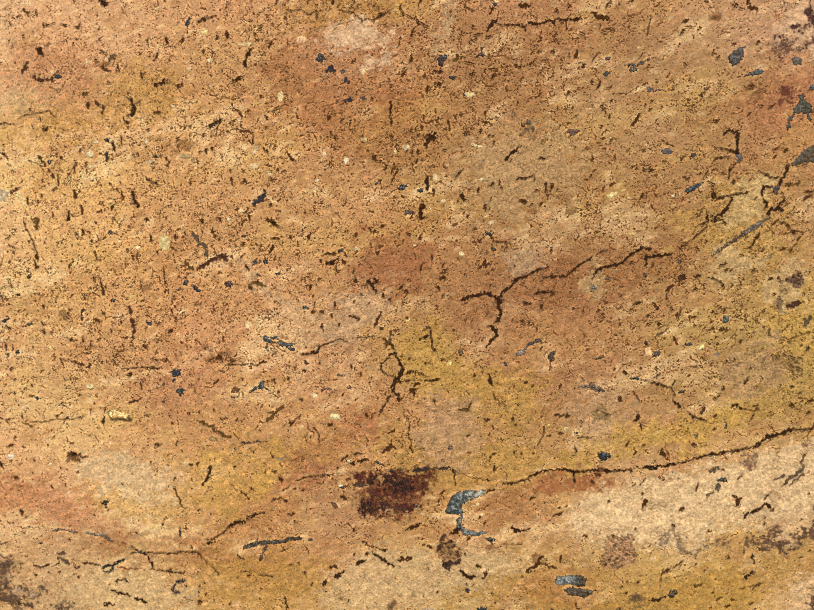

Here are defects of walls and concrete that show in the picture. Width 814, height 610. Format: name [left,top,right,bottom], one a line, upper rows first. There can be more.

crack [459,127,802,348]
crack [419,326,436,352]
crack [300,330,441,415]
crack [732,404,759,420]
crack [486,427,814,493]